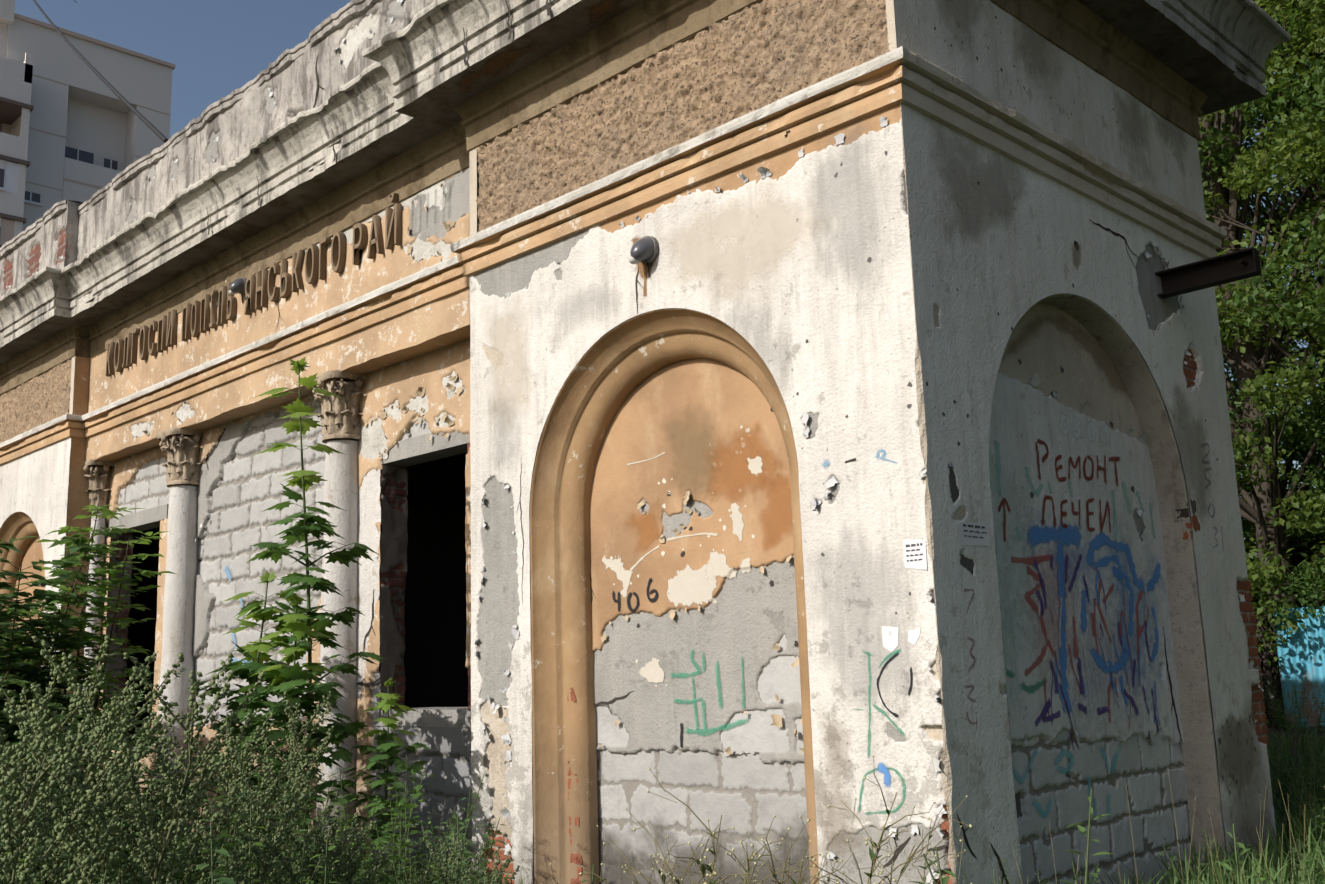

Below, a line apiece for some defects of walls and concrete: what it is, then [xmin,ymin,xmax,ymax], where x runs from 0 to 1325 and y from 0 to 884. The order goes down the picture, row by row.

peeling [305,168,470,264]
peeling [474,104,901,299]
crack [1090,220,1136,267]
spalling [1135,243,1184,331]
peeling [357,371,465,700]
peeling [736,425,763,475]
peeling [811,475,841,512]
spalling [474,476,520,884]
spalling [594,478,809,884]
flaking render [1218,580,1274,794]
spalling [823,726,953,884]
spalling [1010,729,1195,884]